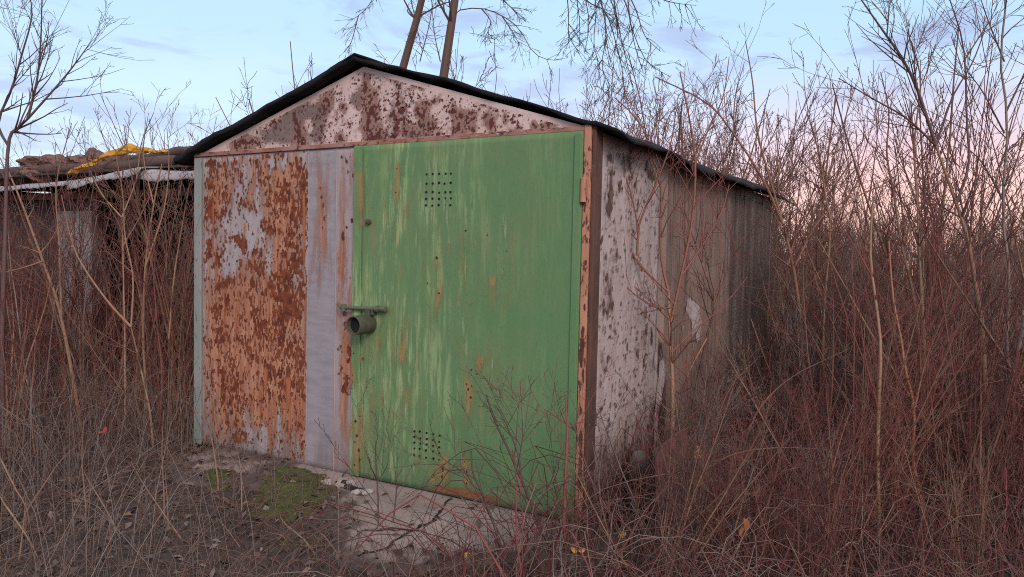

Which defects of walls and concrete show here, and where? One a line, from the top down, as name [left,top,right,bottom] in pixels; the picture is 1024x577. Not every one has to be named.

corrosion [203,151,364,472]
leakage [658,380,666,445]
crack [357,499,451,556]